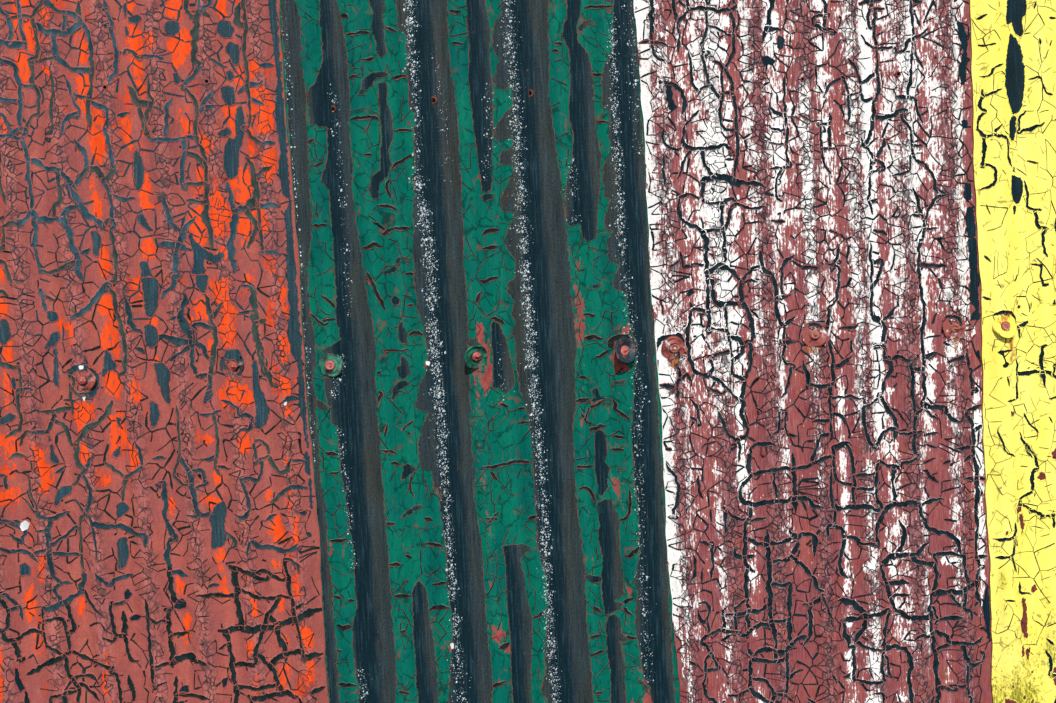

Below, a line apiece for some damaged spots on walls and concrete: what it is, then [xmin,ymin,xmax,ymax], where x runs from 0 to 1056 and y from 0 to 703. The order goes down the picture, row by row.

peeling [122,0,192,99]
crack [449,0,503,47]
peeling [1004,0,1028,145]
peeling [33,114,172,508]
crack [0,0,455,703]
peeling [177,0,397,703]
crack [456,141,516,345]
peeling [368,0,677,703]
crack [547,0,1056,703]
peeling [964,183,986,325]
peeling [1010,161,1025,220]
crack [490,680,512,701]